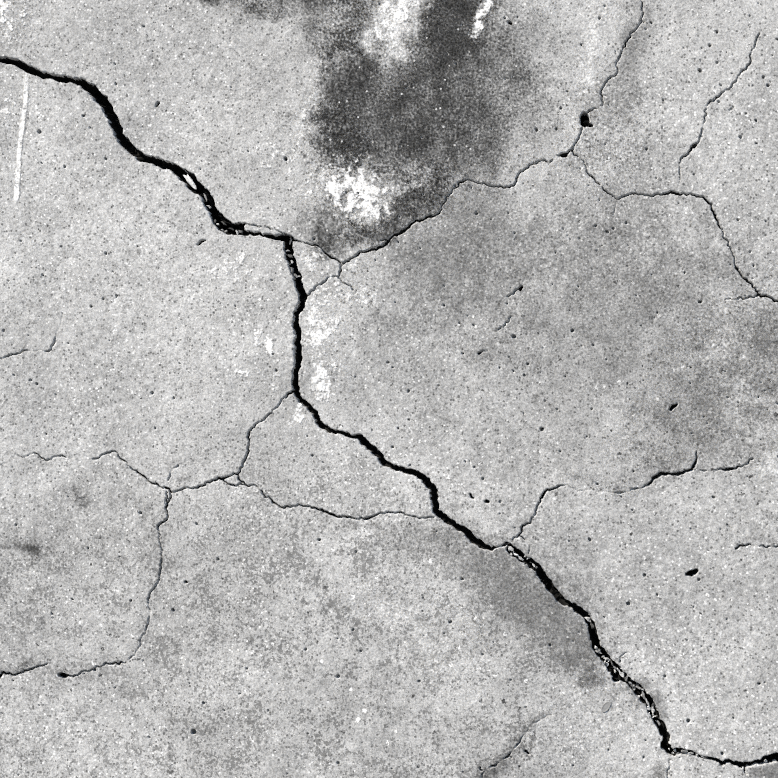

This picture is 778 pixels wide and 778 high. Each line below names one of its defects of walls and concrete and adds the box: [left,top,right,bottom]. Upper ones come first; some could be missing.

damp [580,1,610,85]
damp [243,0,544,271]
crack [487,75,617,189]
crack [586,167,724,239]
efflorescence [210,253,252,281]
crack [0,58,496,551]
efflorescence [254,331,273,356]
damp [397,202,546,307]
crack [734,265,778,302]
crack [642,452,752,488]
crack [0,663,48,679]
crack [501,542,778,773]